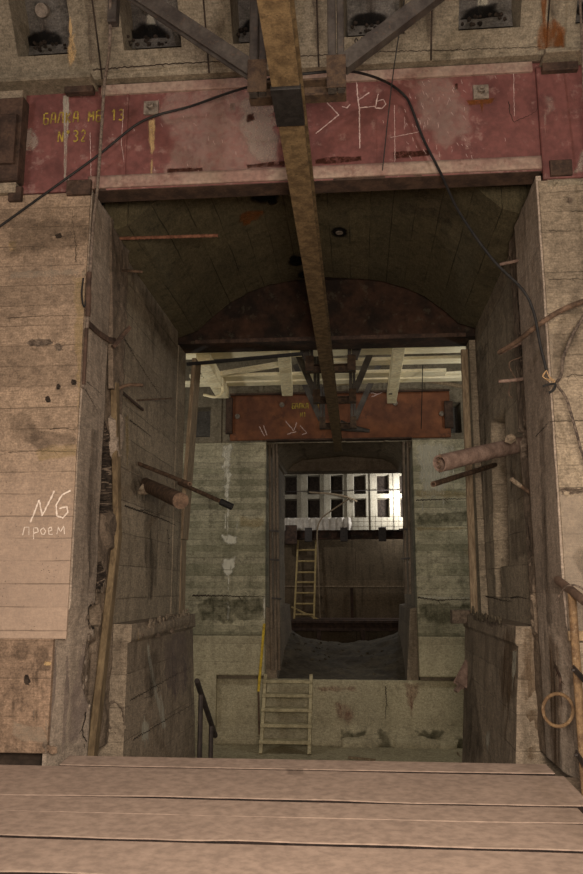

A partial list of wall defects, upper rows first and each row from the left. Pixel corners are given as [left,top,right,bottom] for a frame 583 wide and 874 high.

rust [538,0,565,49]
spalling [99,421,113,513]
water stain [221,443,237,544]
water stain [222,557,235,590]